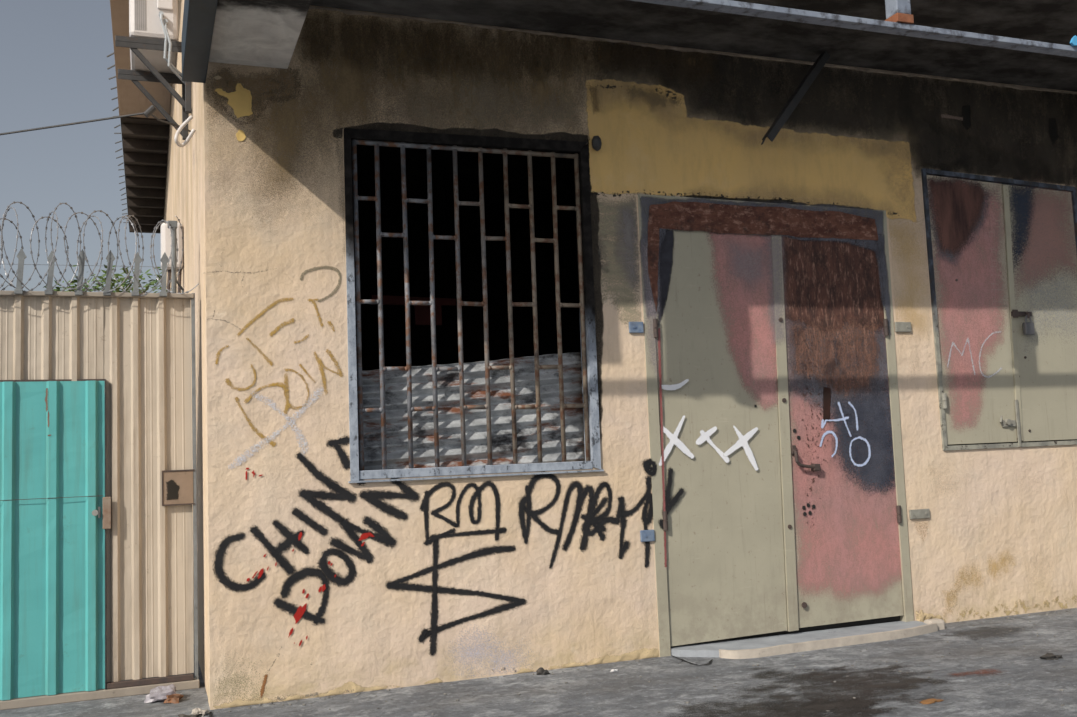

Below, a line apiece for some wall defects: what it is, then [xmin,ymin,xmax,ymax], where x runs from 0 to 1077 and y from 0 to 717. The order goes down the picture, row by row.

leakage [303,16,713,84]
leakage [213,68,302,125]